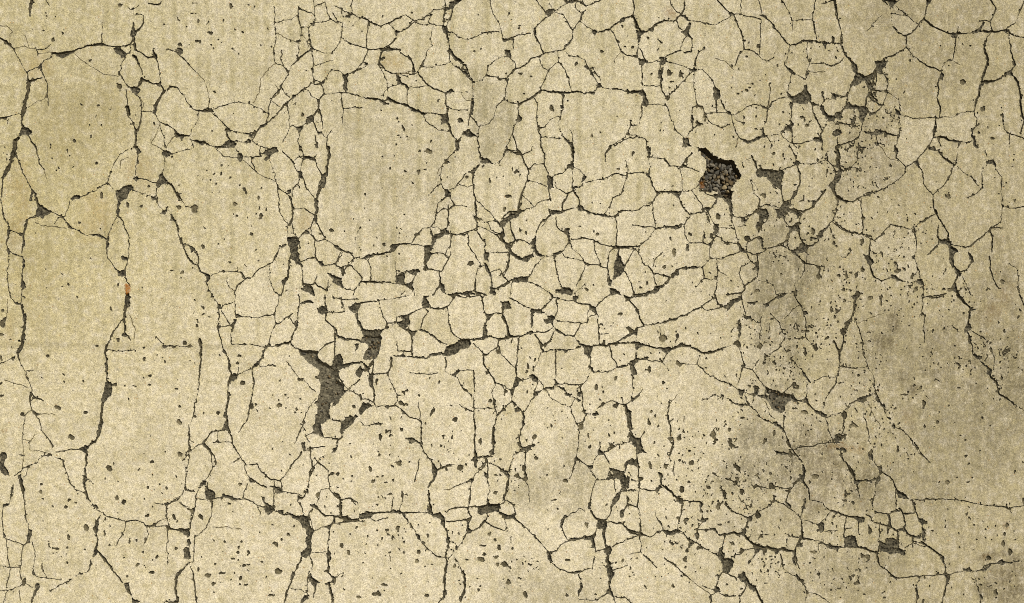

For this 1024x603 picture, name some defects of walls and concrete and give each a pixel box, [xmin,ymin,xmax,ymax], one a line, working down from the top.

crack [28,0,50,17]
spalling [177,2,239,55]
crack [0,446,72,603]
crack [0,13,210,448]
crack [55,214,508,603]
spalling [361,336,382,360]
crack [190,0,1024,488]
crack [444,355,1024,603]
spalling [637,84,1023,599]